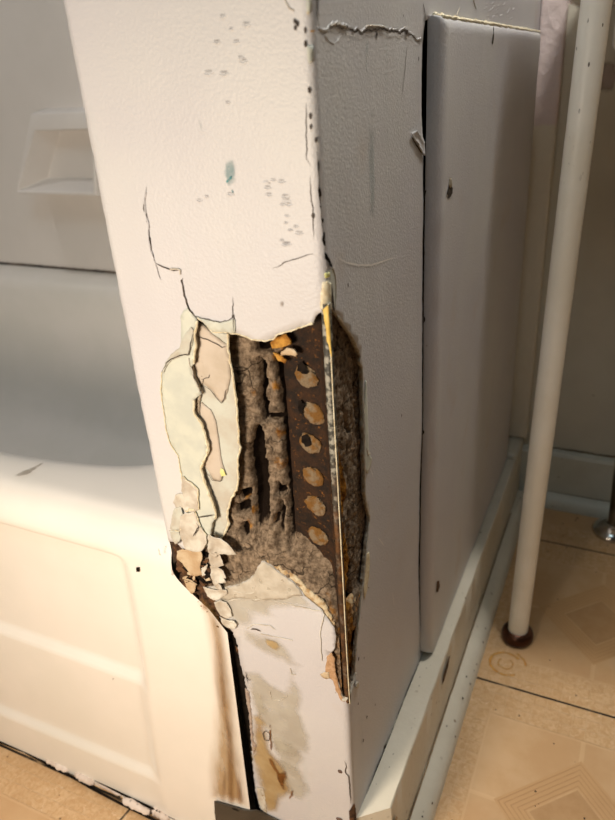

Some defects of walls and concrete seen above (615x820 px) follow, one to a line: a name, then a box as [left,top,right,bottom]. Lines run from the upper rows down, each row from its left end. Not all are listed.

crack [316,0,421,93]
crack [143,191,198,320]
spalling [160,268,372,704]
water stain [254,717,293,810]
peeling [251,676,305,796]